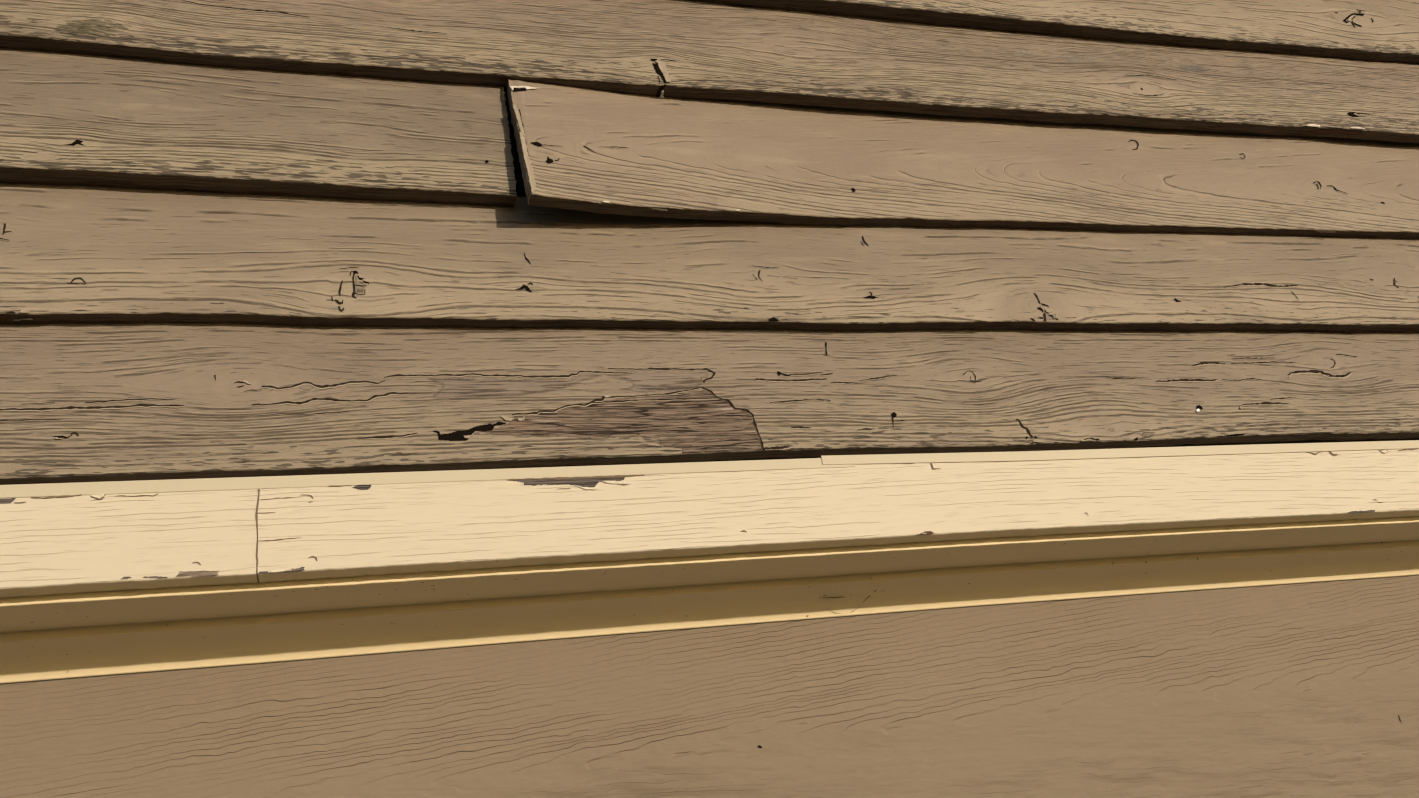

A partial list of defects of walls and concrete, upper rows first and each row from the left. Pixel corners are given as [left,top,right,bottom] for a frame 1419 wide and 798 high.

peeling [404,367,790,454]
peeling [508,475,640,490]
crack [256,489,301,574]